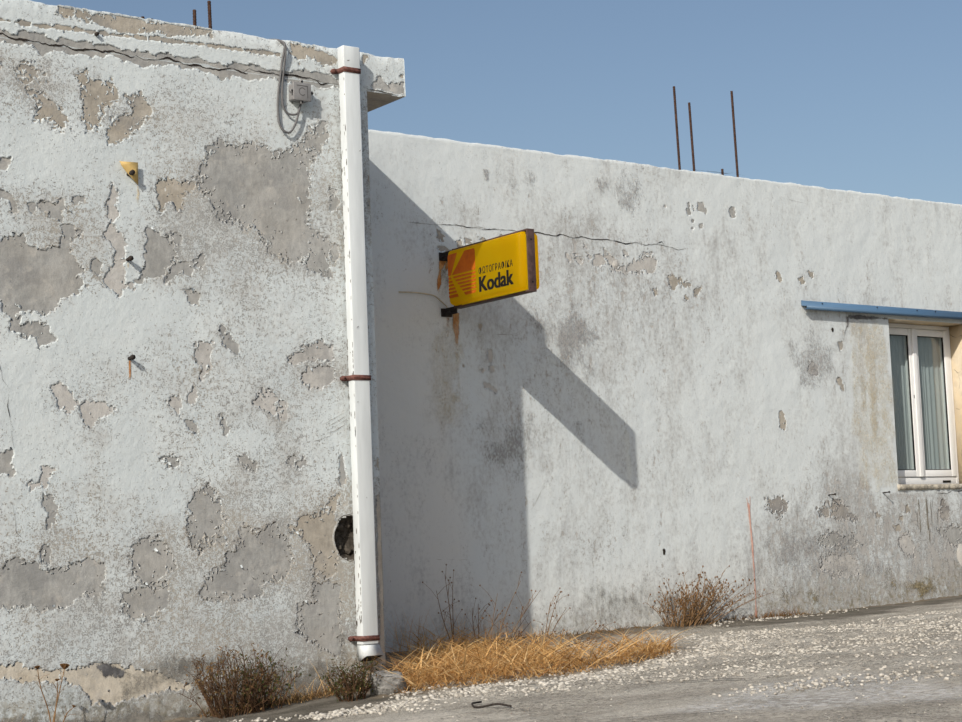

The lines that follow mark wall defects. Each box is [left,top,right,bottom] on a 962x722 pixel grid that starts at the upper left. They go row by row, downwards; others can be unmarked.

crack [0,33,330,85]
peeling [0,5,339,147]
peeling [0,180,206,350]
peeling [152,119,341,281]
crack [412,222,686,250]
peeling [164,323,240,438]
peeling [285,337,337,392]
corrosion [448,313,459,344]
peeling [0,447,107,615]
peeling [118,534,179,626]
peeling [184,452,354,659]
peeling [0,659,192,708]